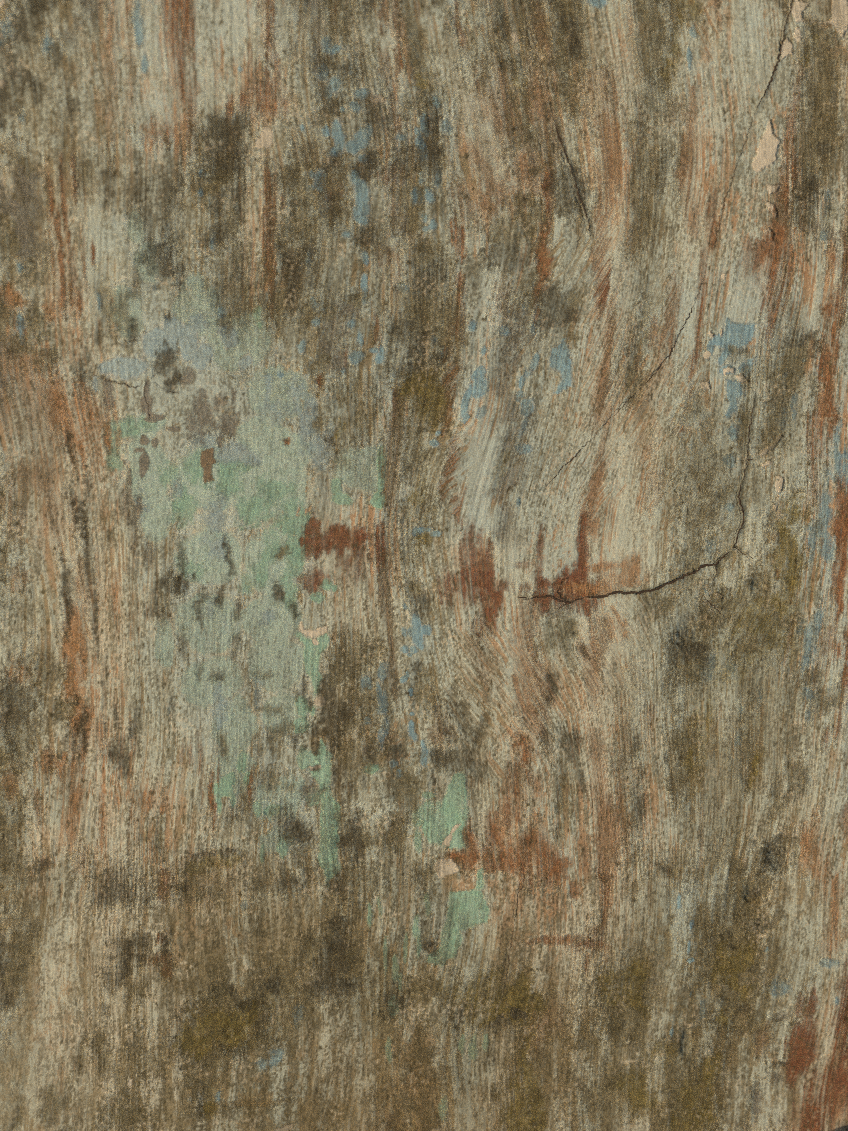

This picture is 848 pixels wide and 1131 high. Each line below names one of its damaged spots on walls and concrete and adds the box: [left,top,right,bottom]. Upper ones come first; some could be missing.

crack [712,0,793,253]
spalling [781,0,848,60]
crack [546,279,704,487]
crack [520,348,761,616]